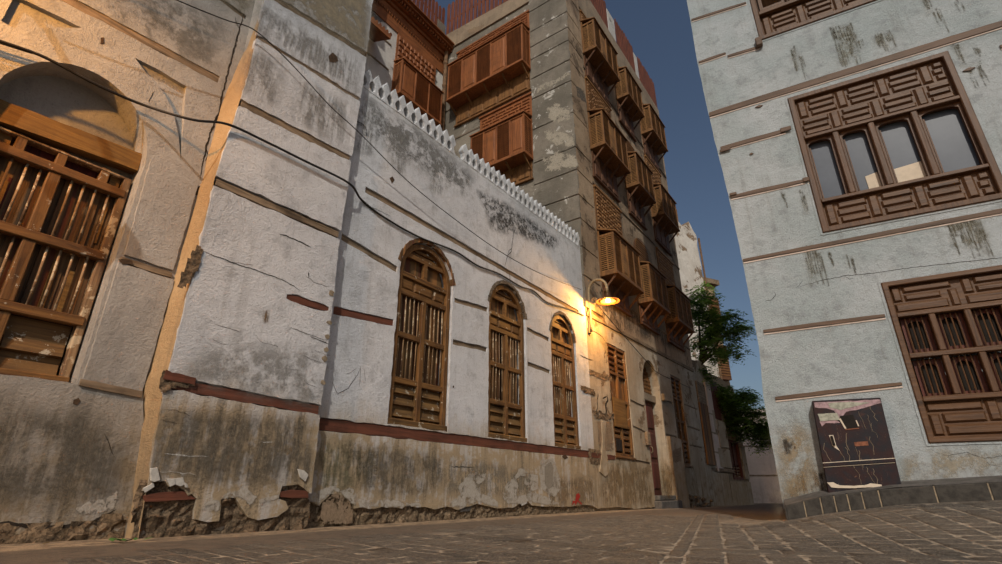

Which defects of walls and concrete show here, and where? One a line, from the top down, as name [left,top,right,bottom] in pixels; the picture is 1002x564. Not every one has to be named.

leakage [480,193,554,247]
leakage [948,220,993,255]
leakage [0,419,119,515]
spalling [0,458,594,545]
leakage [310,445,530,508]
leakage [550,469,650,504]